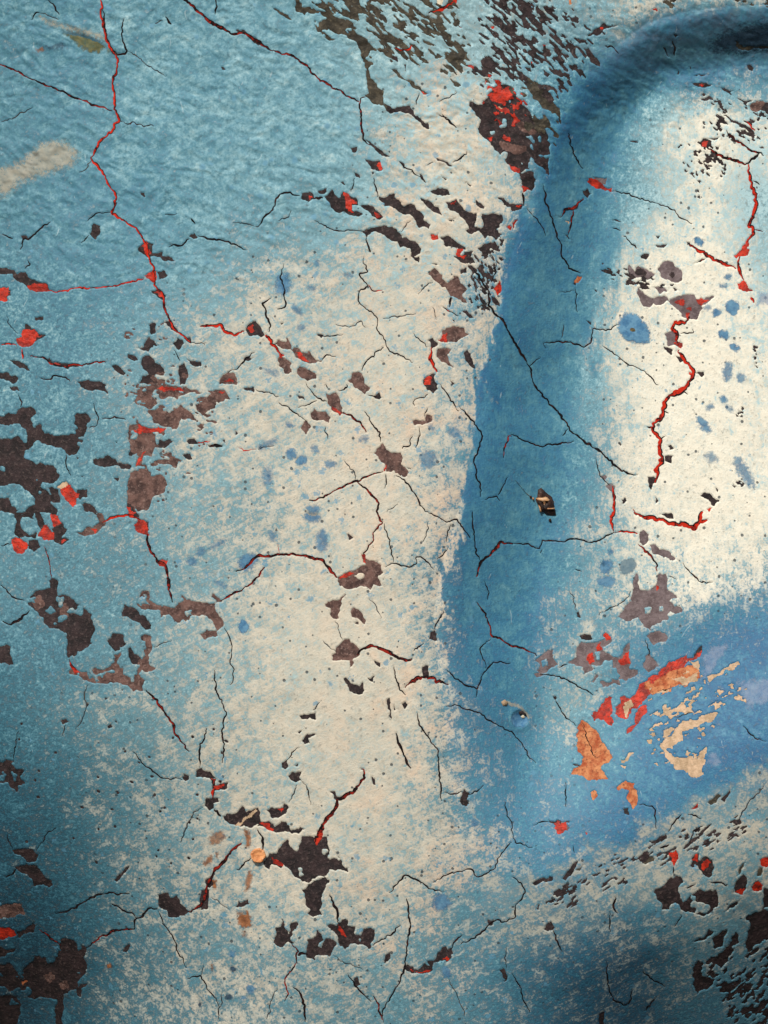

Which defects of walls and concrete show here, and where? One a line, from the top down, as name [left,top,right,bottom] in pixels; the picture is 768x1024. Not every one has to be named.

crack [0,0,257,344]
peeling [0,0,618,751]
crack [336,258,437,369]
peeling [601,219,714,320]
peeling [664,331,683,355]
crack [387,268,709,806]
peeling [0,722,40,792]
peeling [124,574,768,1024]
crack [389,802,533,893]
peeling [0,903,134,1024]
crack [348,975,384,1022]
crack [537,904,562,951]